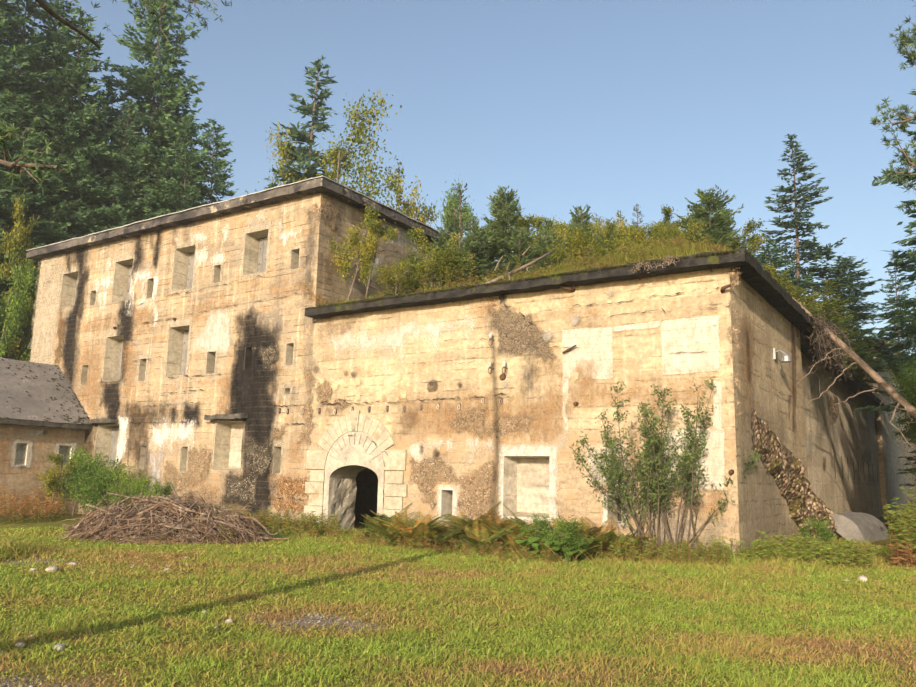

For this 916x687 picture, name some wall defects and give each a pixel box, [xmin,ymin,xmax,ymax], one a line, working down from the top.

leakage [62,248,89,386]
leakage [84,427,96,462]
leakage [100,230,199,491]
leakage [196,308,281,517]
spalling [410,458,496,520]
spalling [490,305,556,361]